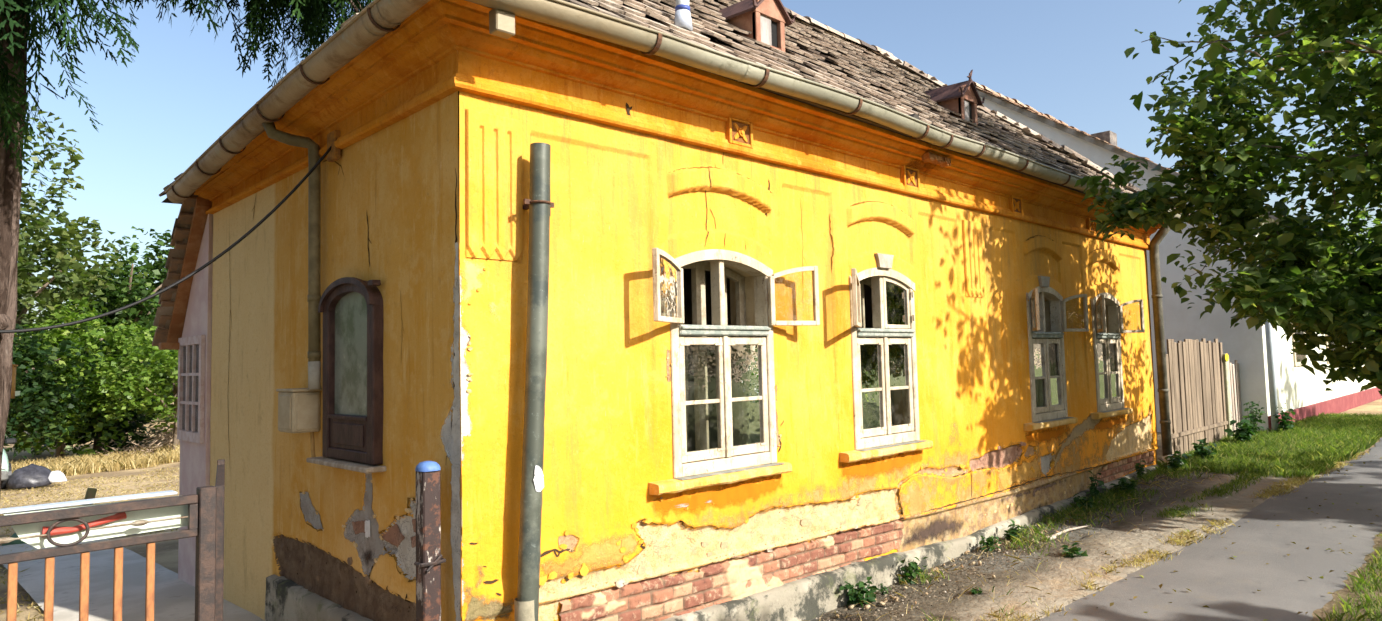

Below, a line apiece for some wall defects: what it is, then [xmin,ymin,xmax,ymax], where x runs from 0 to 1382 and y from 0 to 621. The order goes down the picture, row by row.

crack [673,153,770,246]
crack [801,201,911,311]
flaking render [441,168,487,621]
flaking render [273,473,416,621]
flaking render [538,411,1154,621]